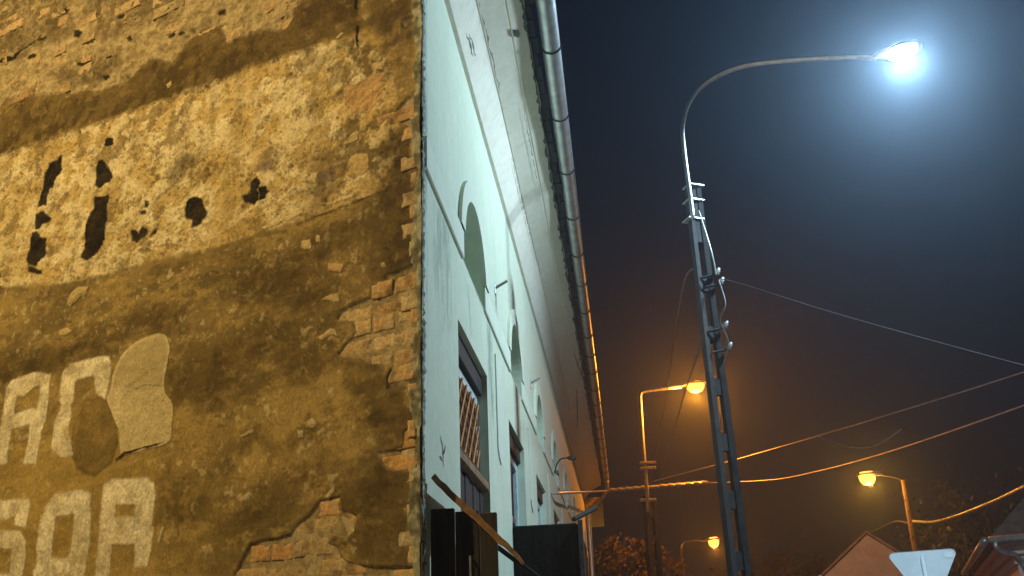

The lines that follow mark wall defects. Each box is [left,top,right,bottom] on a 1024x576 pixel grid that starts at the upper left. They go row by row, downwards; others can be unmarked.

flaking render [236,0,427,576]